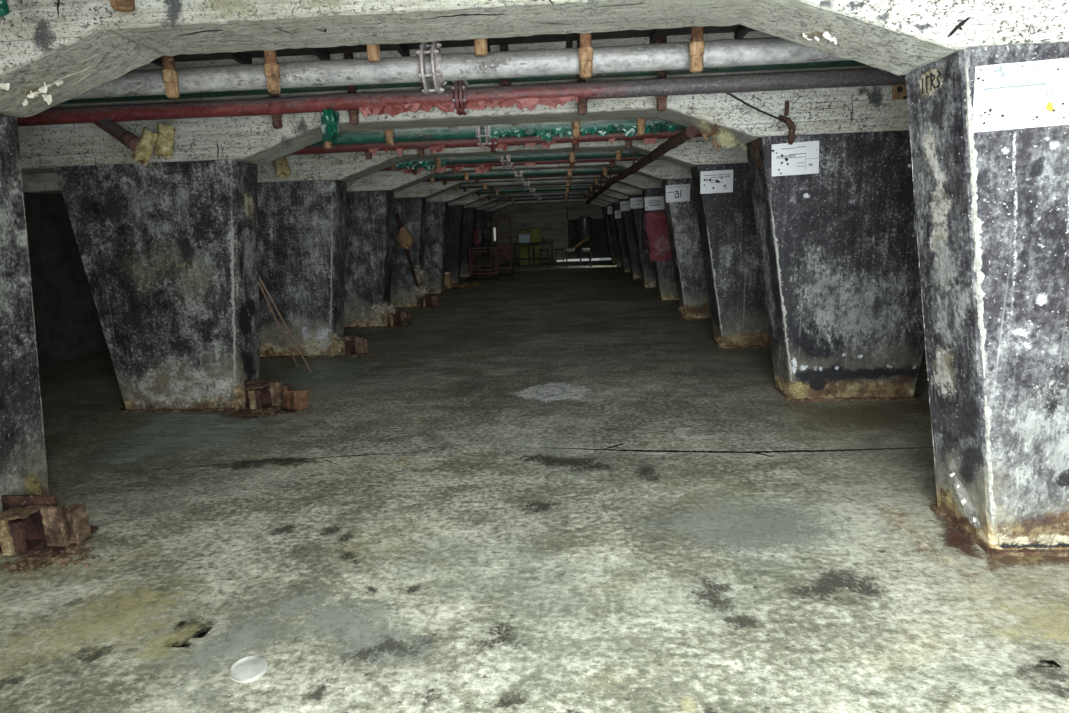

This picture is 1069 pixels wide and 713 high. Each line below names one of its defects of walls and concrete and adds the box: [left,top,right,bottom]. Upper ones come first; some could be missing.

peeling [358,96,573,117]
water stain [129,358,240,409]
corrosion [785,376,913,401]
corrosion [935,488,1069,571]